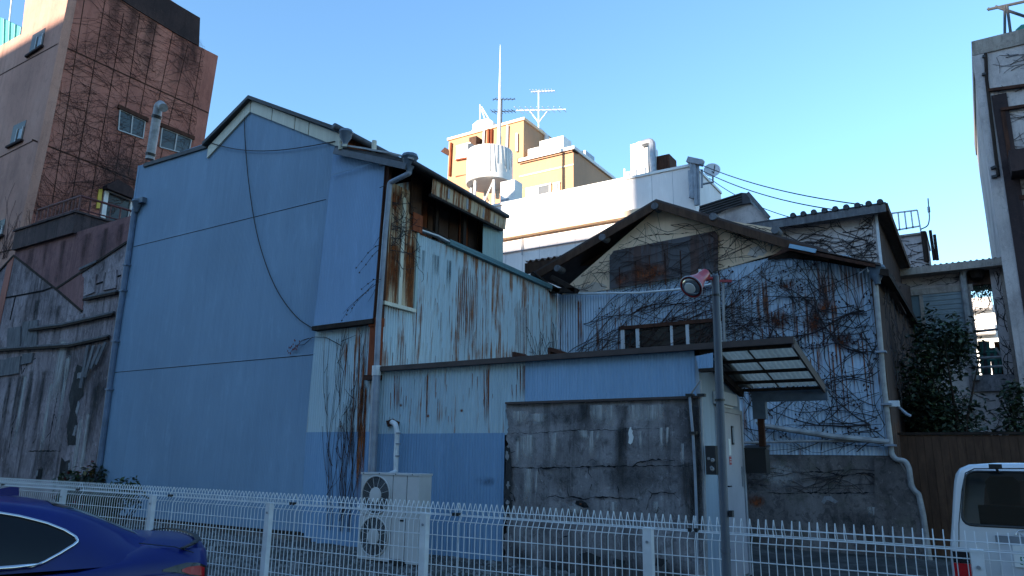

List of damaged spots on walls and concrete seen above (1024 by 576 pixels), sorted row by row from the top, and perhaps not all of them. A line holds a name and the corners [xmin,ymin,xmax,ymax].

rust [389,191,415,290]
spalling [67,365,85,446]
rust [340,334,367,487]
rust [382,306,436,408]
rust [472,370,493,412]
crack [505,428,692,516]
water stain [581,405,669,483]
water stain [682,408,701,519]